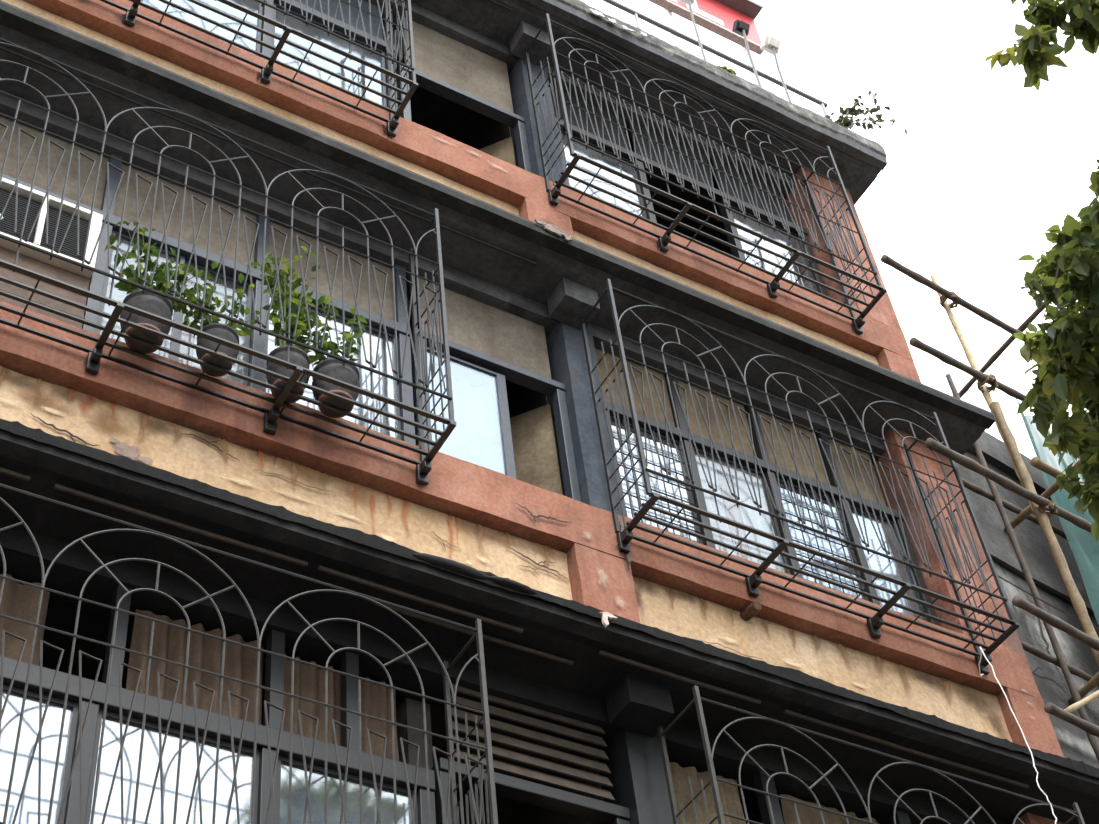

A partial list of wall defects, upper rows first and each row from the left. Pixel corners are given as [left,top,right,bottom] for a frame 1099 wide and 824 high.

crack [30,413,99,446]
flaking render [109,438,153,464]
crack [182,433,337,493]
crack [516,503,571,523]
crack [506,546,569,581]